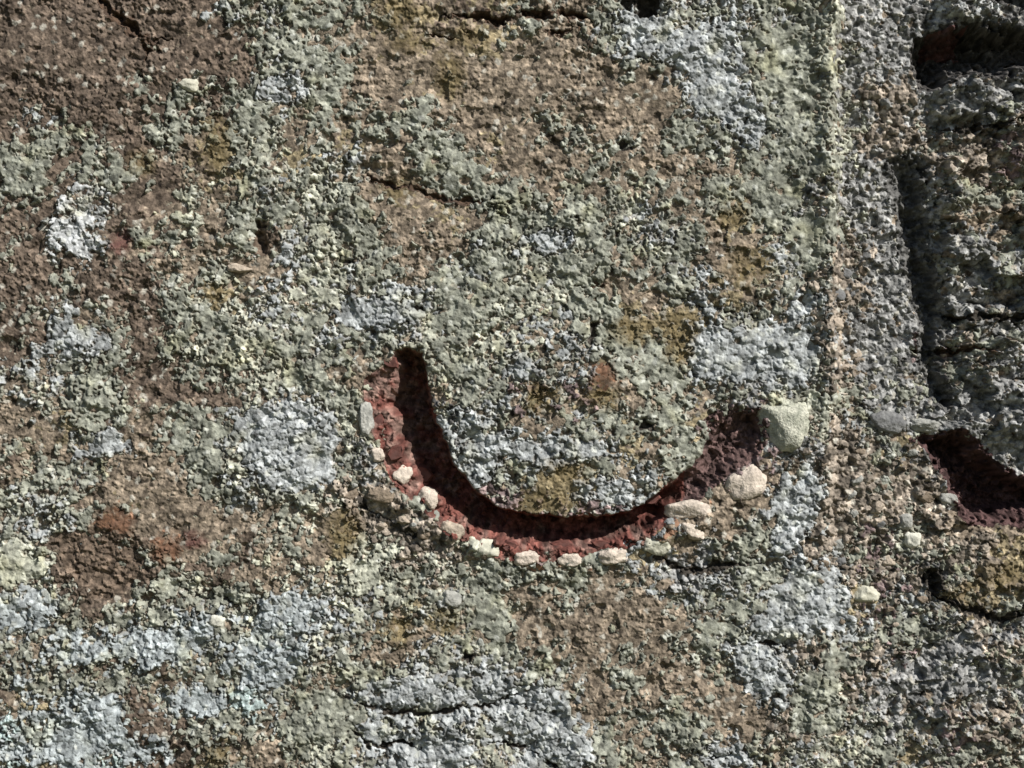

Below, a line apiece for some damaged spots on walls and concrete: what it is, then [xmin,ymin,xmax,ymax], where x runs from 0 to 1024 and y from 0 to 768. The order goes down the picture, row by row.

spalling [635,418,654,431]
peeling [418,465,434,483]
spalling [909,427,1024,532]